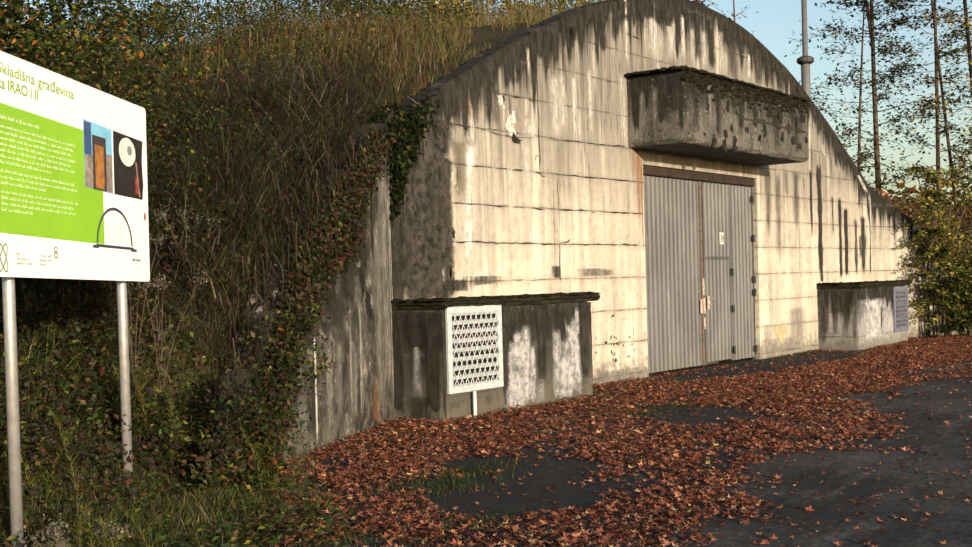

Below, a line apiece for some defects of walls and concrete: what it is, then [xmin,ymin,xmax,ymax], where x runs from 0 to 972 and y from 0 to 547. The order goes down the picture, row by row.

leakage [594,0,627,59]
leakage [552,78,580,133]
leakage [623,73,723,137]
leakage [302,77,497,435]
leakage [794,165,889,340]
leakage [501,302,590,408]